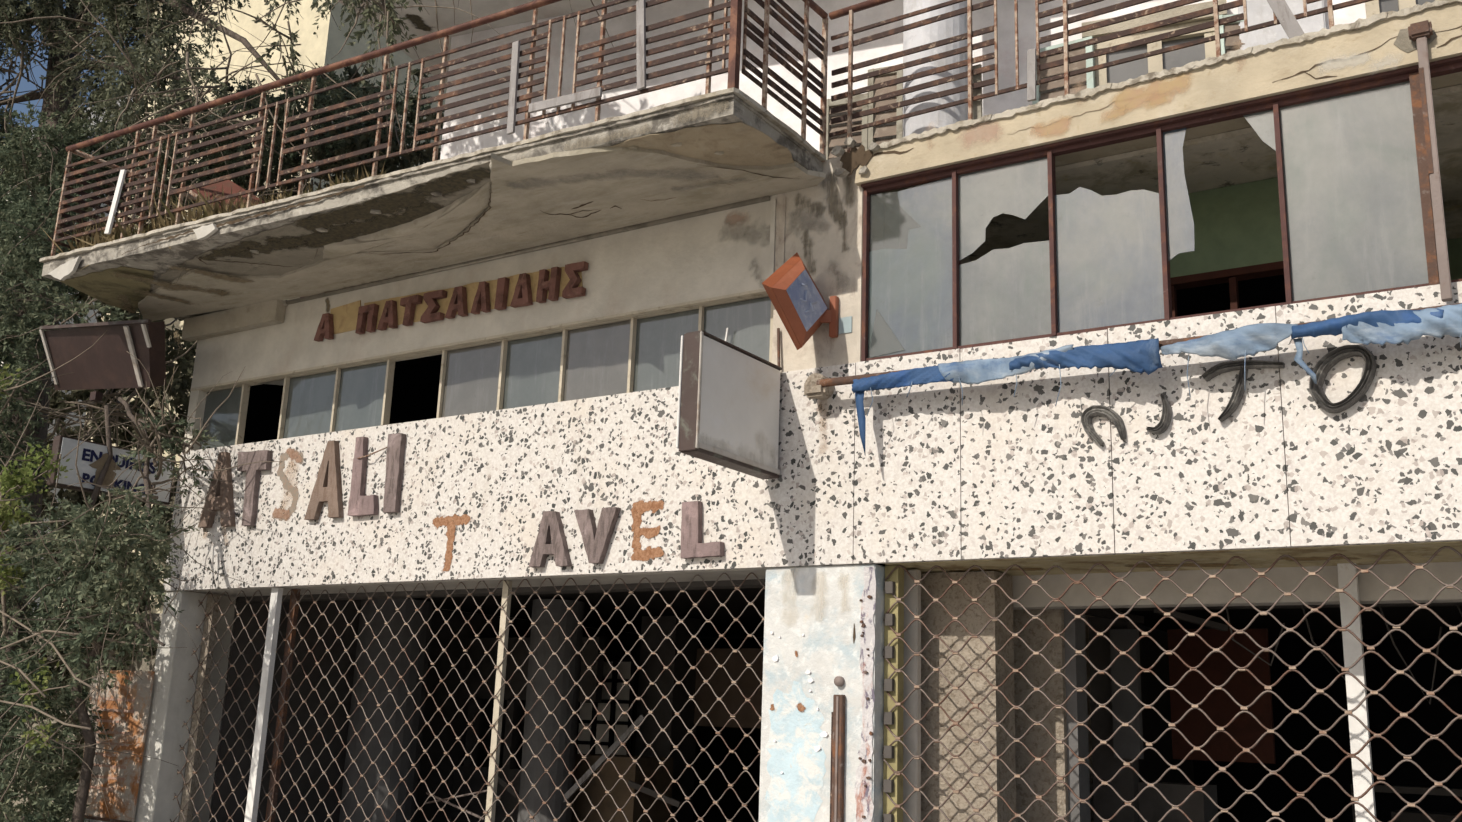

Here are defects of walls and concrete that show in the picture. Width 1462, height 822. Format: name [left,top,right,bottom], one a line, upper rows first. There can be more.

crack [1272,36,1397,83]
crack [1437,26,1462,48]
spalling [48,160,491,312]
damp [792,173,853,273]
peeling [764,670,828,822]
peeling [854,567,876,822]